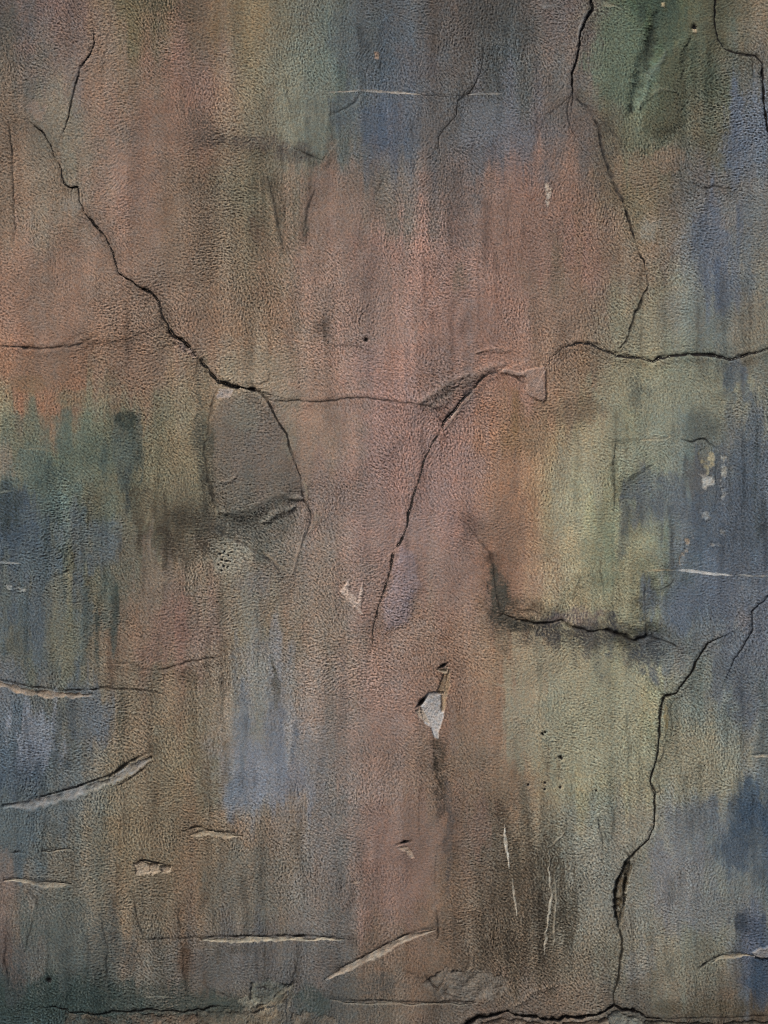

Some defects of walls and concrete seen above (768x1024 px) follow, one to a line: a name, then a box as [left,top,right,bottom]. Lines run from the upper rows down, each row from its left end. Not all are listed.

crack [0,10,502,649]
crack [608,437,655,508]
crack [537,0,768,367]
spalling [3,745,153,812]
spalling [133,859,173,876]
leakage [0,336,418,1016]
hole [324,928,435,981]
spalling [415,662,451,739]
crack [404,524,768,1024]
leakage [474,301,768,1022]